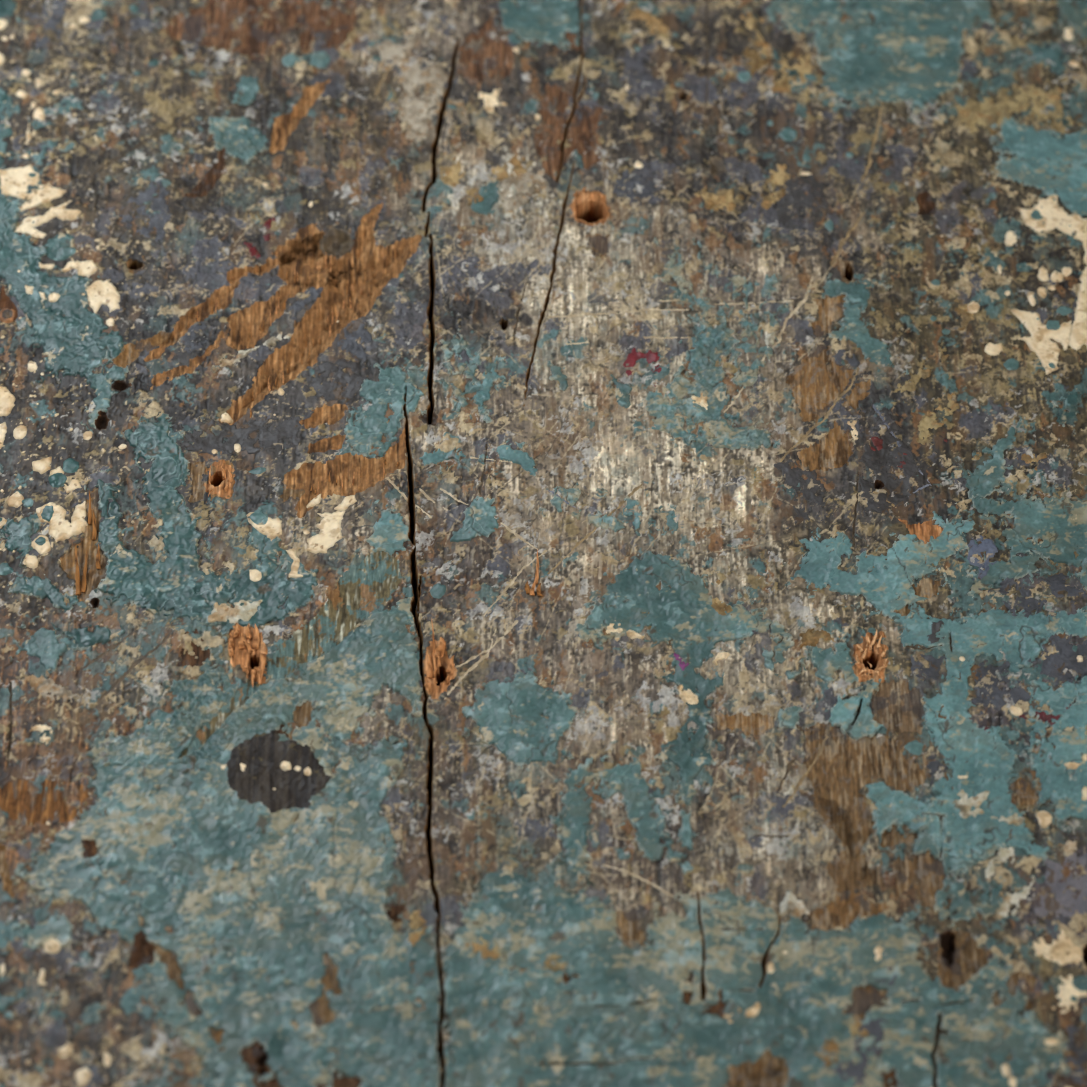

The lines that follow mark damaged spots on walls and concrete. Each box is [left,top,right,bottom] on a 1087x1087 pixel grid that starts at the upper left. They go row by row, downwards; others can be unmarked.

peeling [128,0,360,60]
peeling [0,184,457,1087]
crack [403,38,460,1087]
peeling [433,329,512,423]
peeling [419,440,538,476]
peeling [471,180,501,215]
crack [513,0,586,407]
peeling [587,233,612,257]
peeling [611,169,663,205]
peeling [610,238,787,451]
peeling [774,258,920,524]
peeling [442,417,1087,1087]